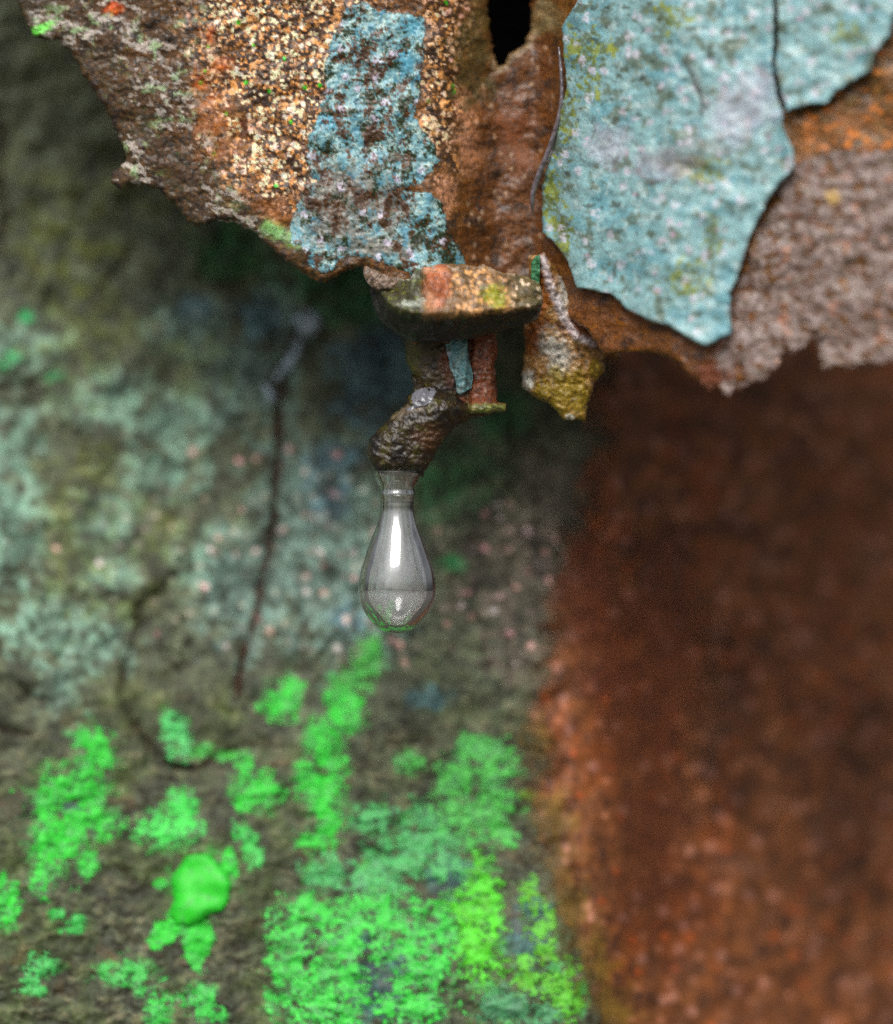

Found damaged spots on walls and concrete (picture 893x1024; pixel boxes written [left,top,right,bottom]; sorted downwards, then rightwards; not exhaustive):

corrosion [18,0,725,477]
peeling [290,1,465,274]
peeling [542,0,893,395]
corrosion [724,185,801,338]
crack [772,0,784,107]
corrosion [772,0,893,196]
corrosion [852,256,893,324]
corrosion [528,317,893,1024]